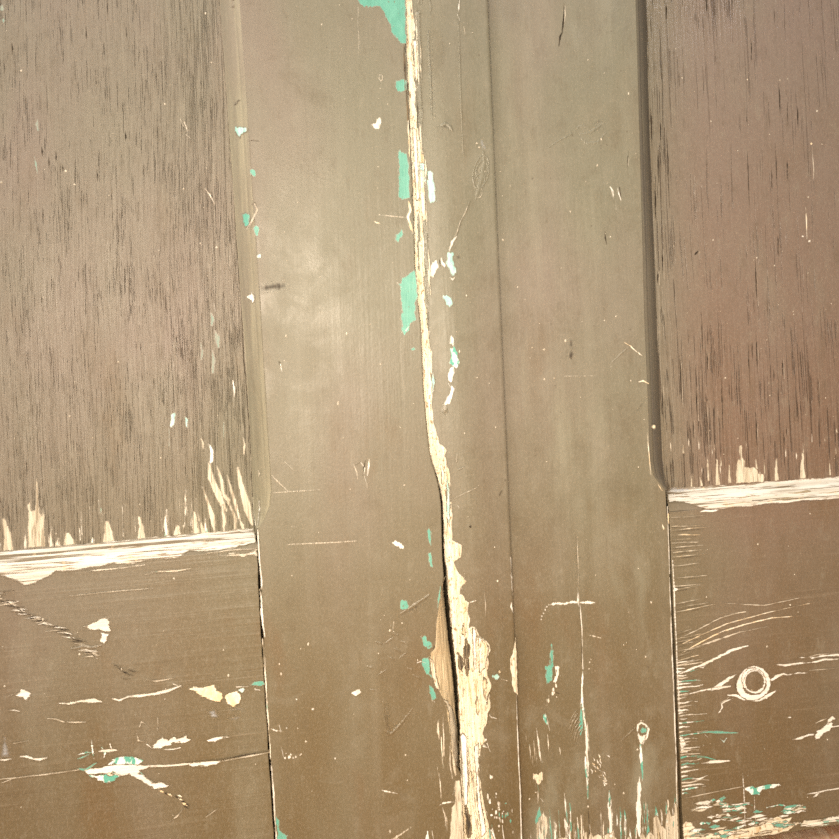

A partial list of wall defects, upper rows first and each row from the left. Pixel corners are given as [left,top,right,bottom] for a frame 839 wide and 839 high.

peeling [357,0,410,121]
peeling [427,235,458,281]
peeling [397,270,418,336]
peeling [442,335,461,406]
peeling [666,476,839,512]
peeling [0,528,258,659]
peeling [146,735,192,750]
peeling [110,681,265,707]
peeling [416,635,459,777]
peeling [792,716,839,741]
peeling [76,740,190,822]
peeling [621,720,650,839]